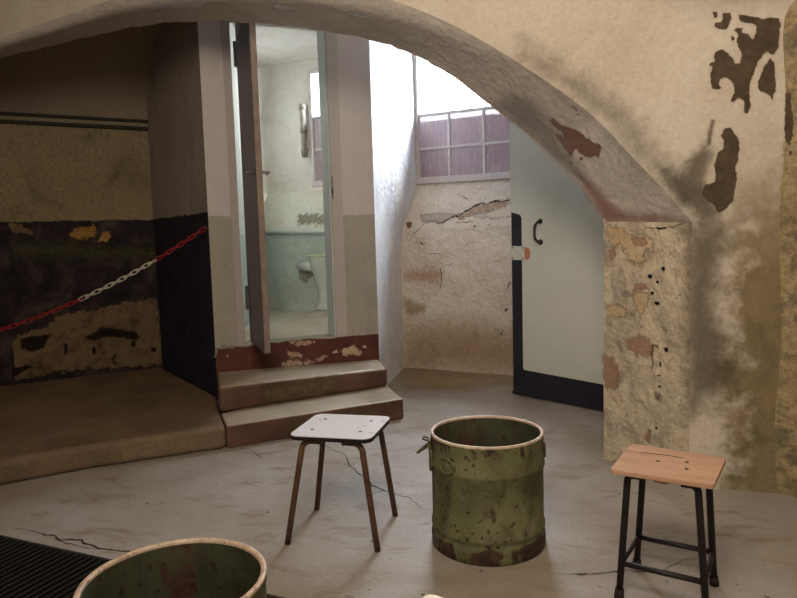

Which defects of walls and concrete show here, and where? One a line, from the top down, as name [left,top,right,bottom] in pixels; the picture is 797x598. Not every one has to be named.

flaking render [709,12,781,113]
peeling [505,101,601,167]
flaking render [784,92,793,155]
leakage [673,120,715,219]
flaking render [702,127,740,212]
flaking render [69,223,111,243]
crack [411,195,511,235]
flaking render [11,296,162,381]
peeling [281,340,366,367]
flaking render [626,334,654,357]
leakage [689,232,723,395]
crack [16,528,130,552]